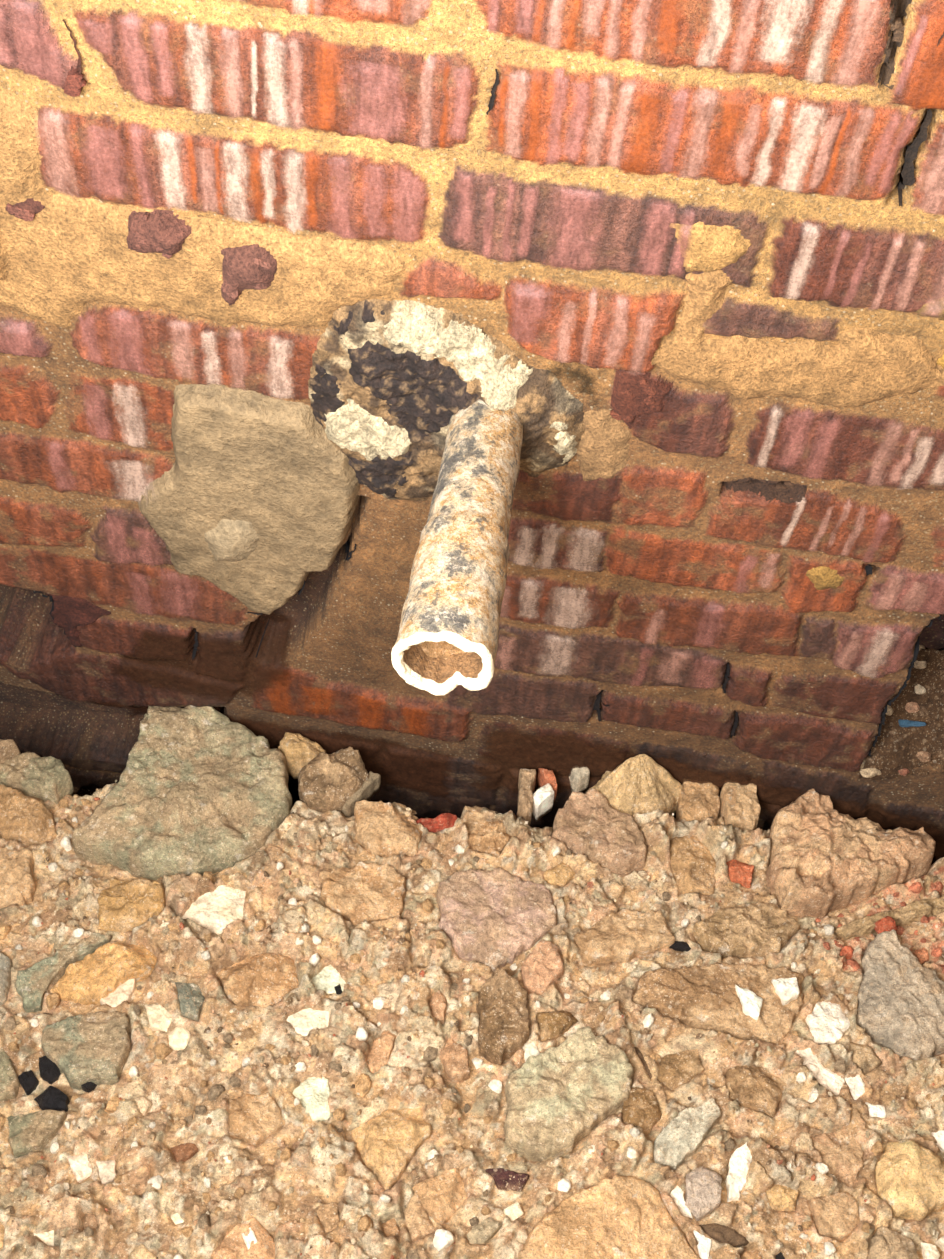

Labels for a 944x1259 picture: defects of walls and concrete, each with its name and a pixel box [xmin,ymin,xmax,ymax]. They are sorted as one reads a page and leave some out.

crack [897,109,932,206]
spalling [47,594,111,647]